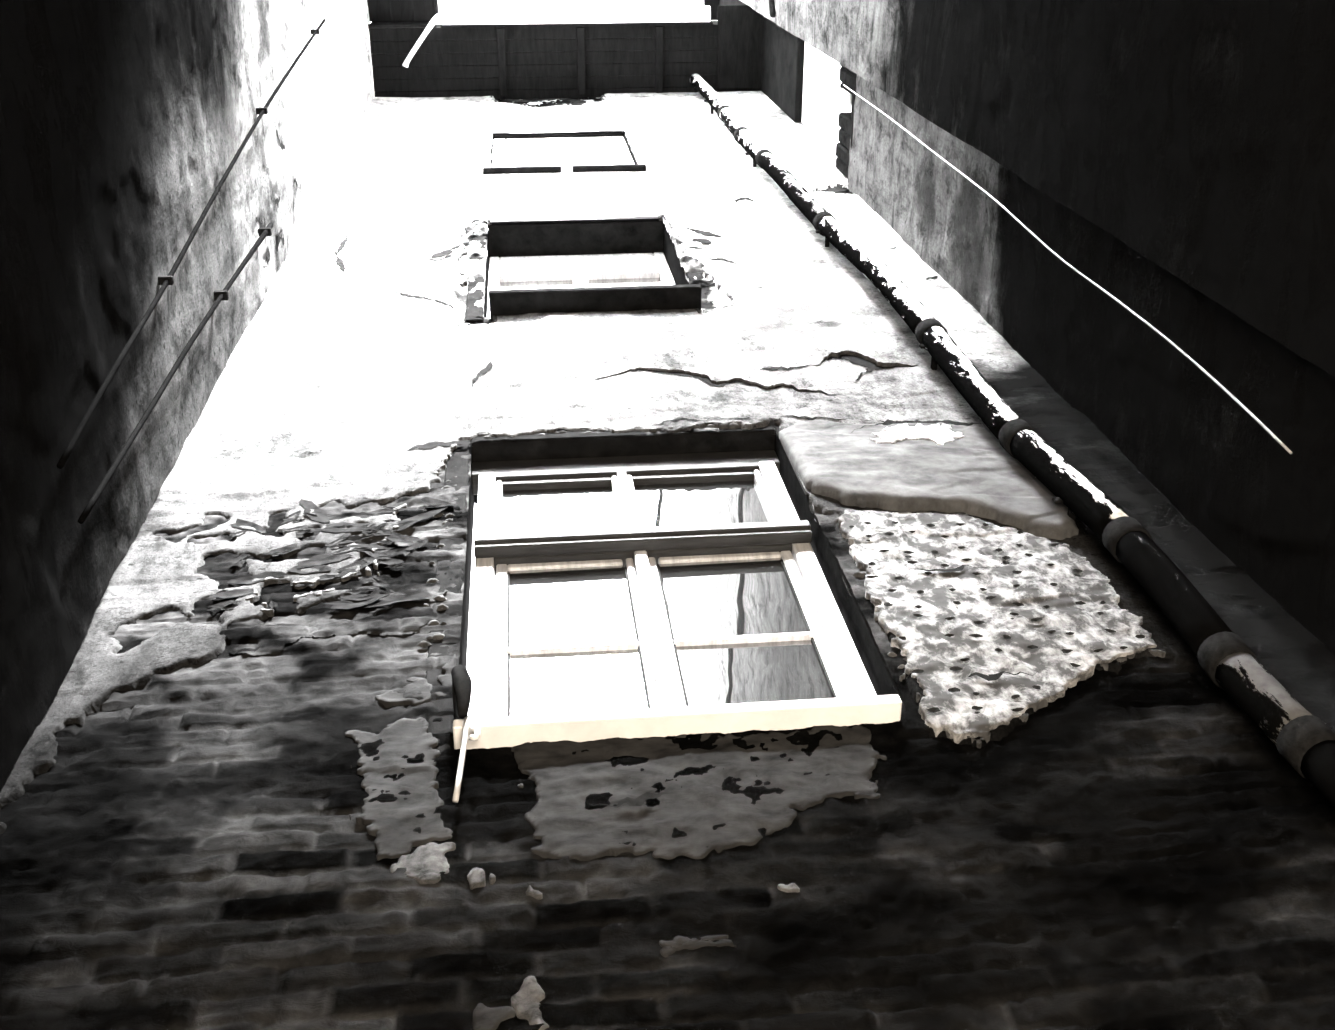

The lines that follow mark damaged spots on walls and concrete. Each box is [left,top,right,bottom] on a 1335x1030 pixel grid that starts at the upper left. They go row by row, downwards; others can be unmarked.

flaking render [453,219,497,326]
flaking render [659,214,735,314]
crack [594,320,981,433]